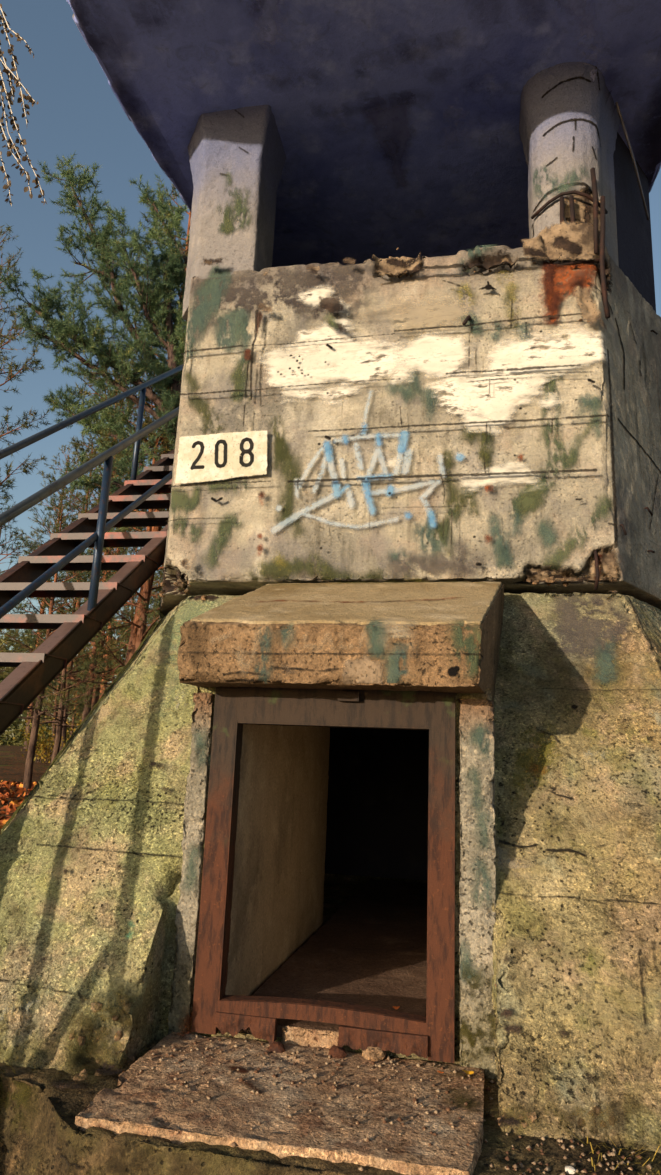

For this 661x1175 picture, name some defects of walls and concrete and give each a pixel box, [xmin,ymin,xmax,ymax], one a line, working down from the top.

crack [541,66,600,98]
peeling [264,167,613,432]
corrosion [541,261,596,322]
crack [166,118,661,550]
spalling [159,559,222,602]
spalling [518,546,619,592]